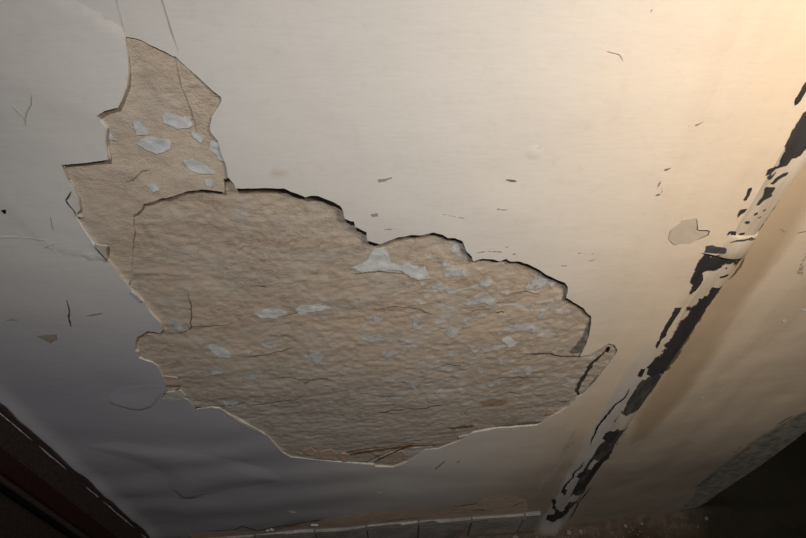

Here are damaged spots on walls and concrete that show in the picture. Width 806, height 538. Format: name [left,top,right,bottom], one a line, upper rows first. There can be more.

flaking render [64,37,617,466]
peeling [546,245,740,522]
peeling [668,218,709,245]
peeling [728,112,806,236]